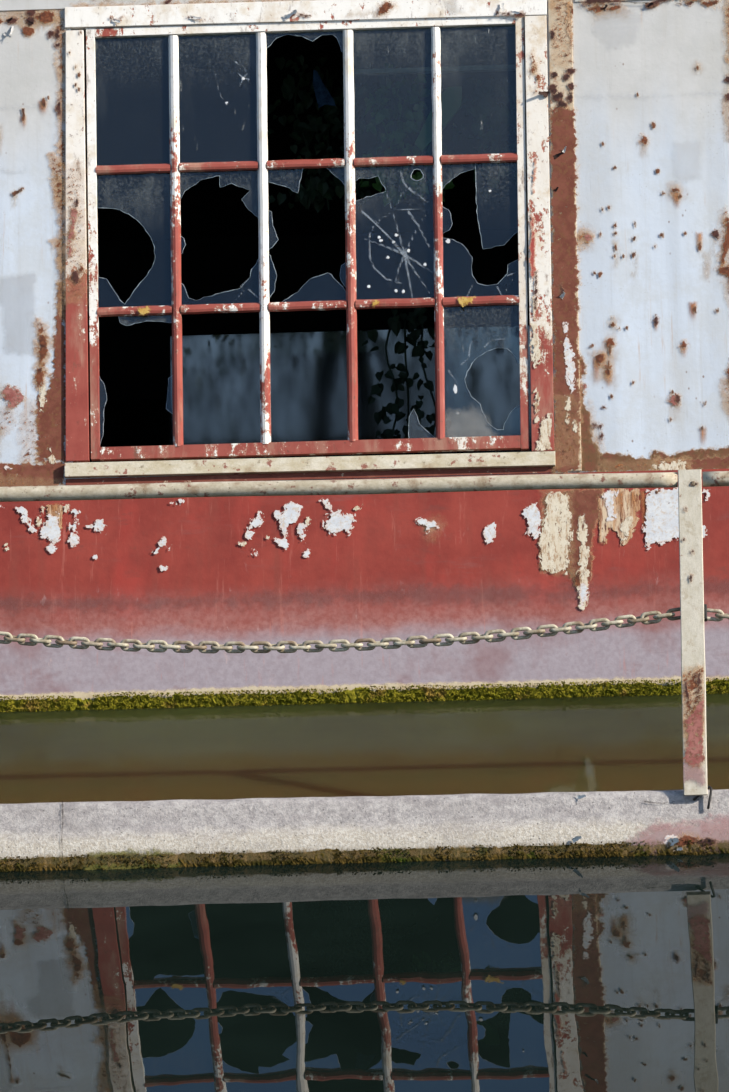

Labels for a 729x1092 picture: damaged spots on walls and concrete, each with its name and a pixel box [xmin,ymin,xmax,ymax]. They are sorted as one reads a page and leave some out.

corrosion [548,0,729,108]
corrosion [0,9,66,316]
corrosion [684,211,729,292]
corrosion [590,317,628,381]
corrosion [668,390,681,422]
peeling [15,503,107,554]
peeling [238,499,362,558]
peeling [522,487,679,610]
corrosion [683,667,705,785]